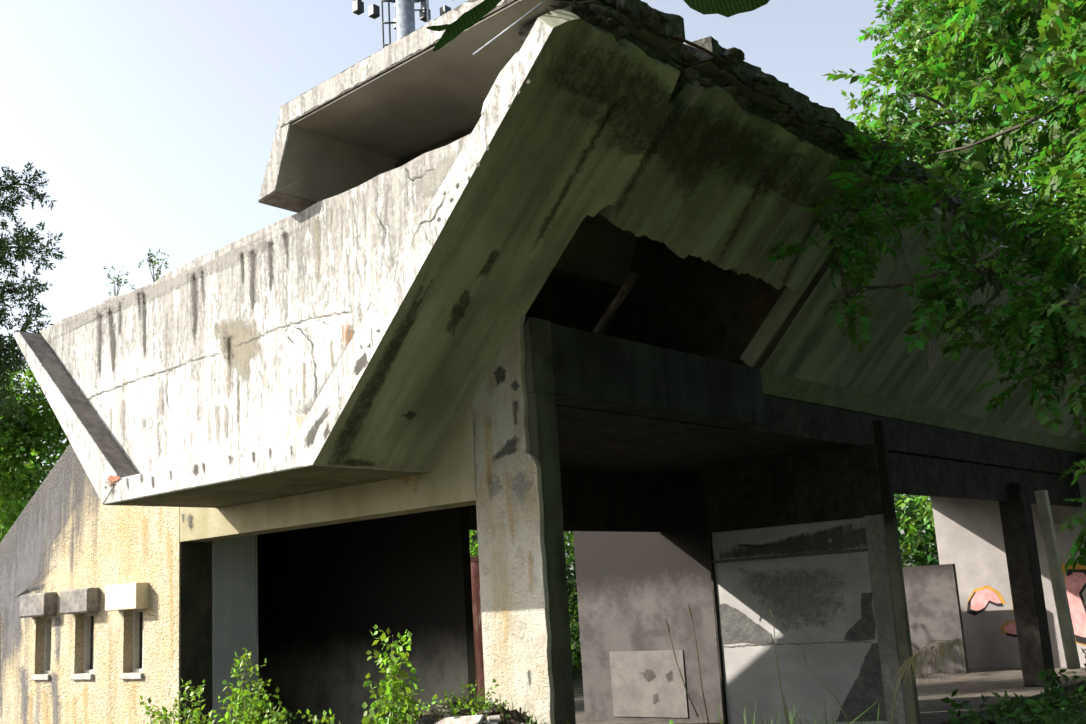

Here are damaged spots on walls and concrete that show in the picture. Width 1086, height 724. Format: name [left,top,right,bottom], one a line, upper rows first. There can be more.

spalling [473,0,935,189]
water stain [56,229,288,375]
water stain [314,197,366,278]
crack [371,163,451,251]
water stain [537,50,820,286]
water stain [109,401,125,440]
crack [86,301,373,458]
water stain [207,321,260,443]
water stain [493,367,520,461]
water stain [0,463,75,724]